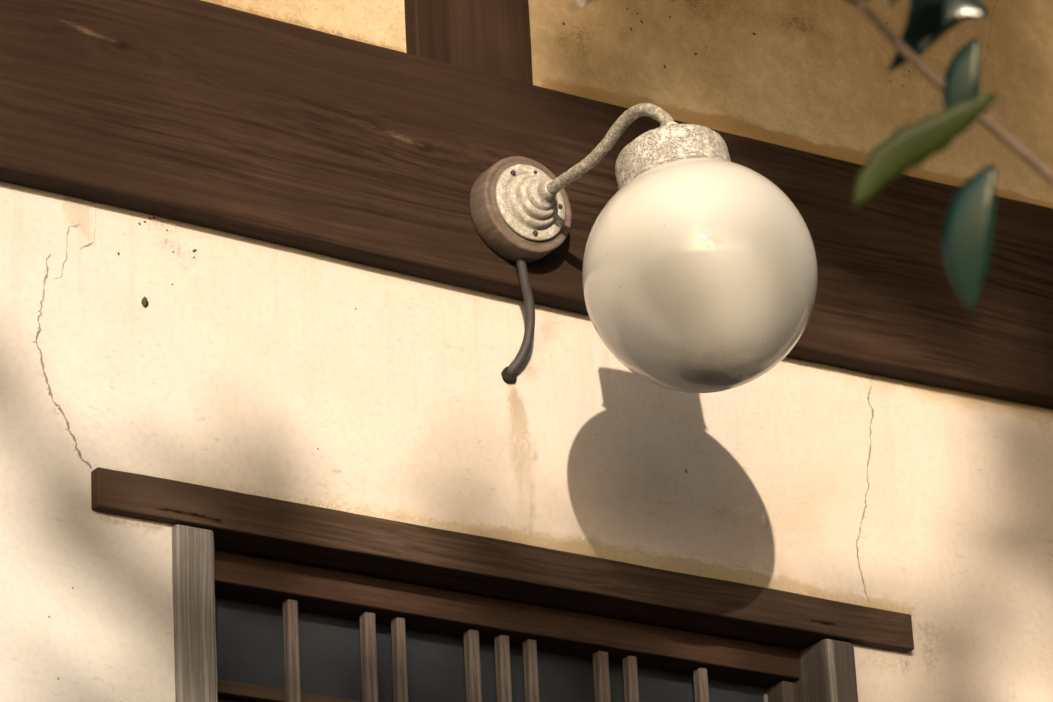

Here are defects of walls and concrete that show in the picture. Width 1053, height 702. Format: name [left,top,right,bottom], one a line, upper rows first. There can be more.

crack [32,203,96,469]
damp [510,388,526,435]
crack [856,374,874,602]